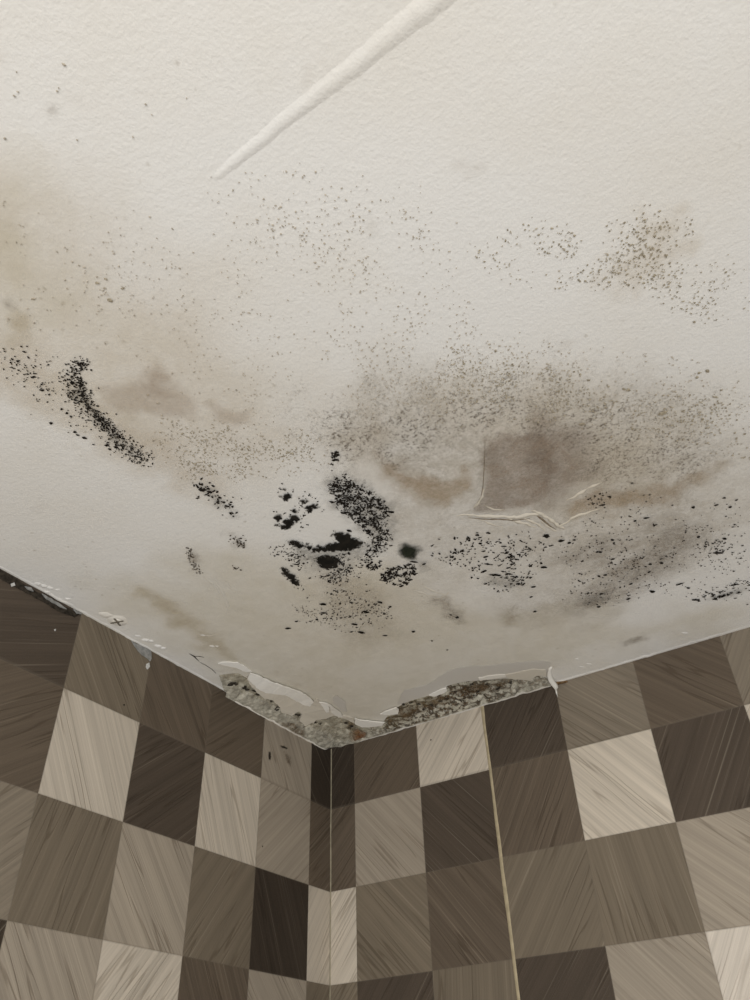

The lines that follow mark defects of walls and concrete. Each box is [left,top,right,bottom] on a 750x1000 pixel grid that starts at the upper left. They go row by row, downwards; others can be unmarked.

water stain [1,172,750,636]
spalling [218,661,568,750]